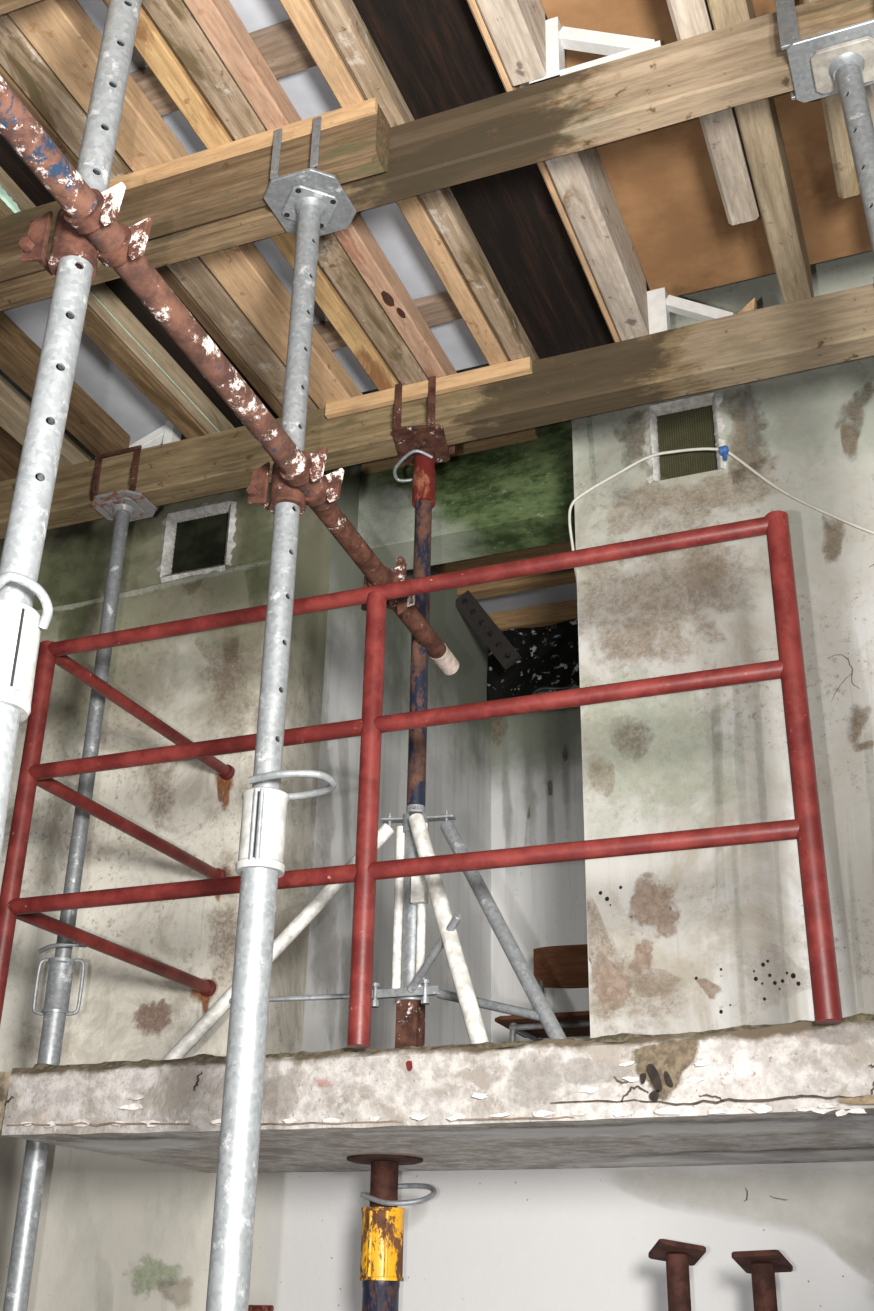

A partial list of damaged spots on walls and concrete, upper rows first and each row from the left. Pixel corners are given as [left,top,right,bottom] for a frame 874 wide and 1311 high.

water stain [841,426,858,454]
spalling [514,1038,710,1117]
crack [456,1064,874,1120]
crack [5,1096,221,1126]
peeling [112,1094,189,1127]
crack [261,1118,402,1126]
peeling [748,1104,772,1114]
water stain [431,1117,874,1280]